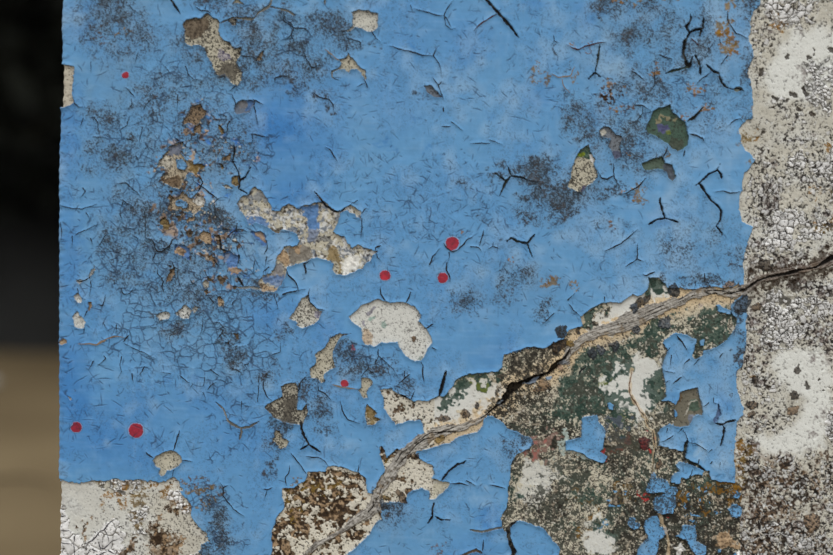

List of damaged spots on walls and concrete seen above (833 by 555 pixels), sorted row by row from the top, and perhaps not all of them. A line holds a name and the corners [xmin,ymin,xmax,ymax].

peeling [183,14,243,86]
crack [629,12,756,125]
peeling [646,105,689,151]
peeling [238,187,378,292]
crack [429,230,535,279]
crack [605,198,679,276]
crack [696,164,740,236]
peeling [265,383,308,450]
peeling [272,278,742,555]
crack [298,253,833,555]
crack [264,420,327,496]
peeling [60,450,210,555]